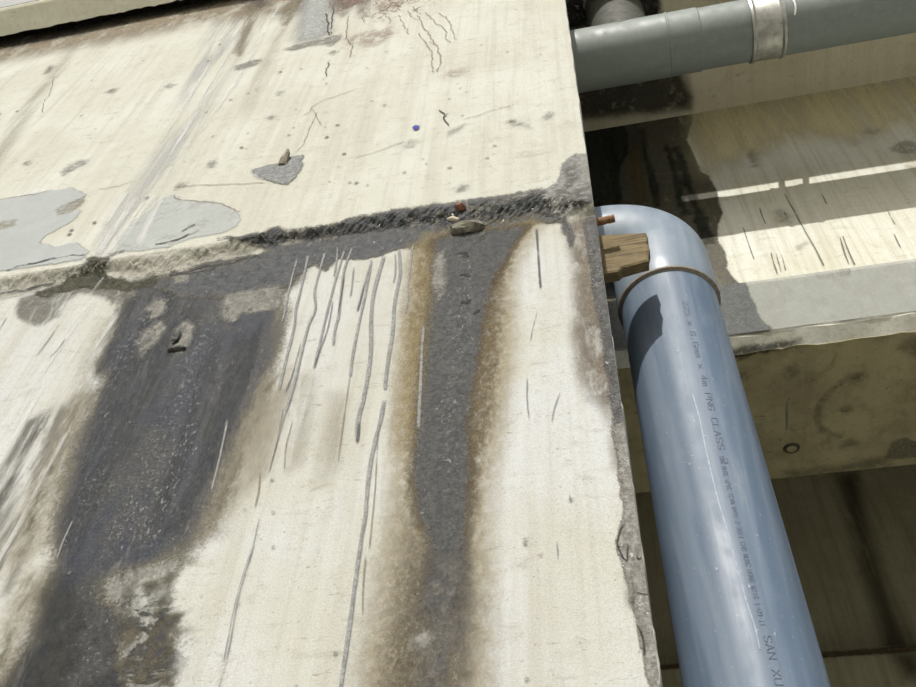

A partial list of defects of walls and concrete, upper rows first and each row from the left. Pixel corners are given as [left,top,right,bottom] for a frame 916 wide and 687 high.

crack [304,4,456,141]
peeling [0,187,88,270]
peeling [116,194,240,252]
damp [0,189,565,687]